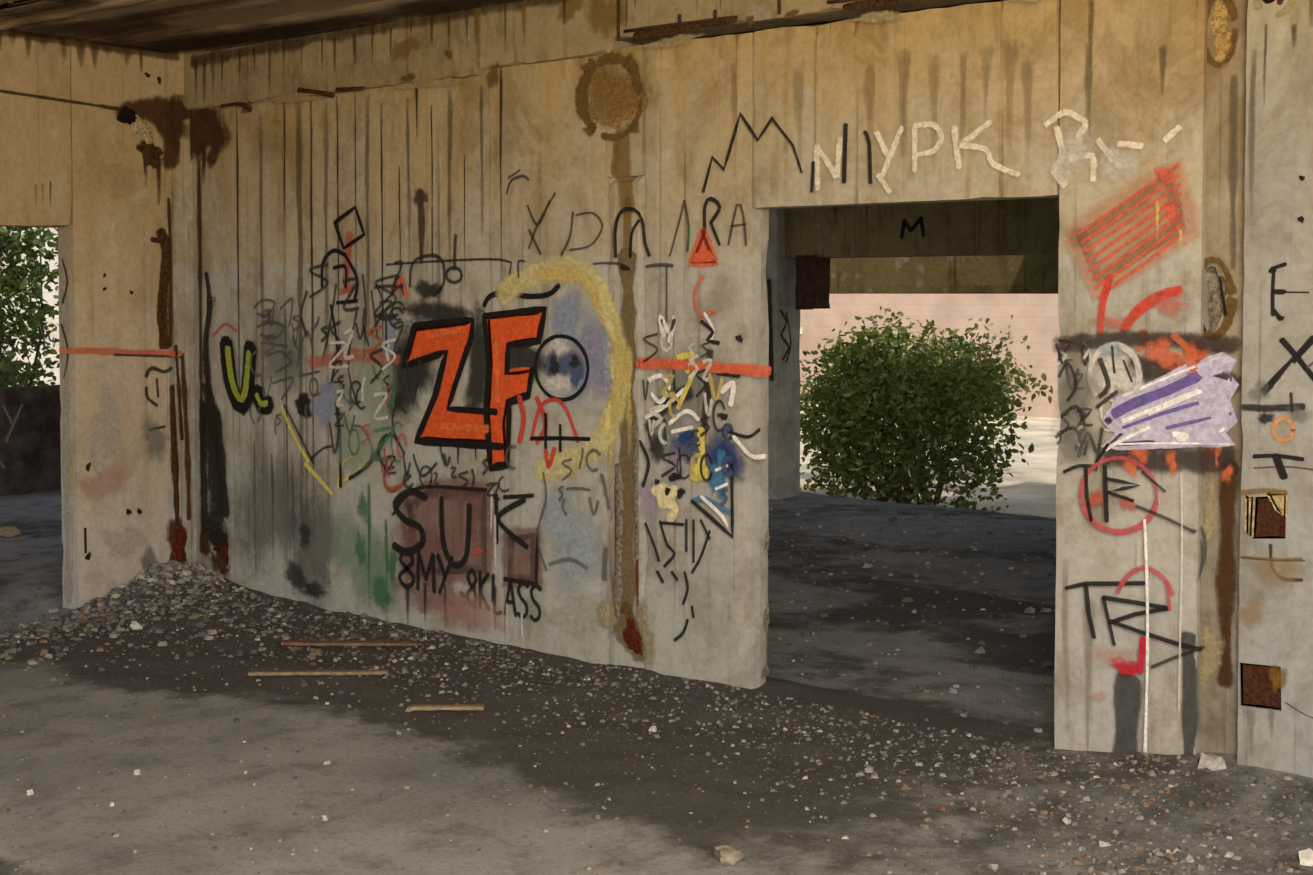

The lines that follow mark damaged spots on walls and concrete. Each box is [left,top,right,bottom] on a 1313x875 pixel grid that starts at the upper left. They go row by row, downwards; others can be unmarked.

leakage [0,0,563,85]
leakage [355,109,383,297]
leakage [399,88,465,276]
rust [611,130,634,250]
rust [143,518,230,576]
rust [1199,466,1303,710]